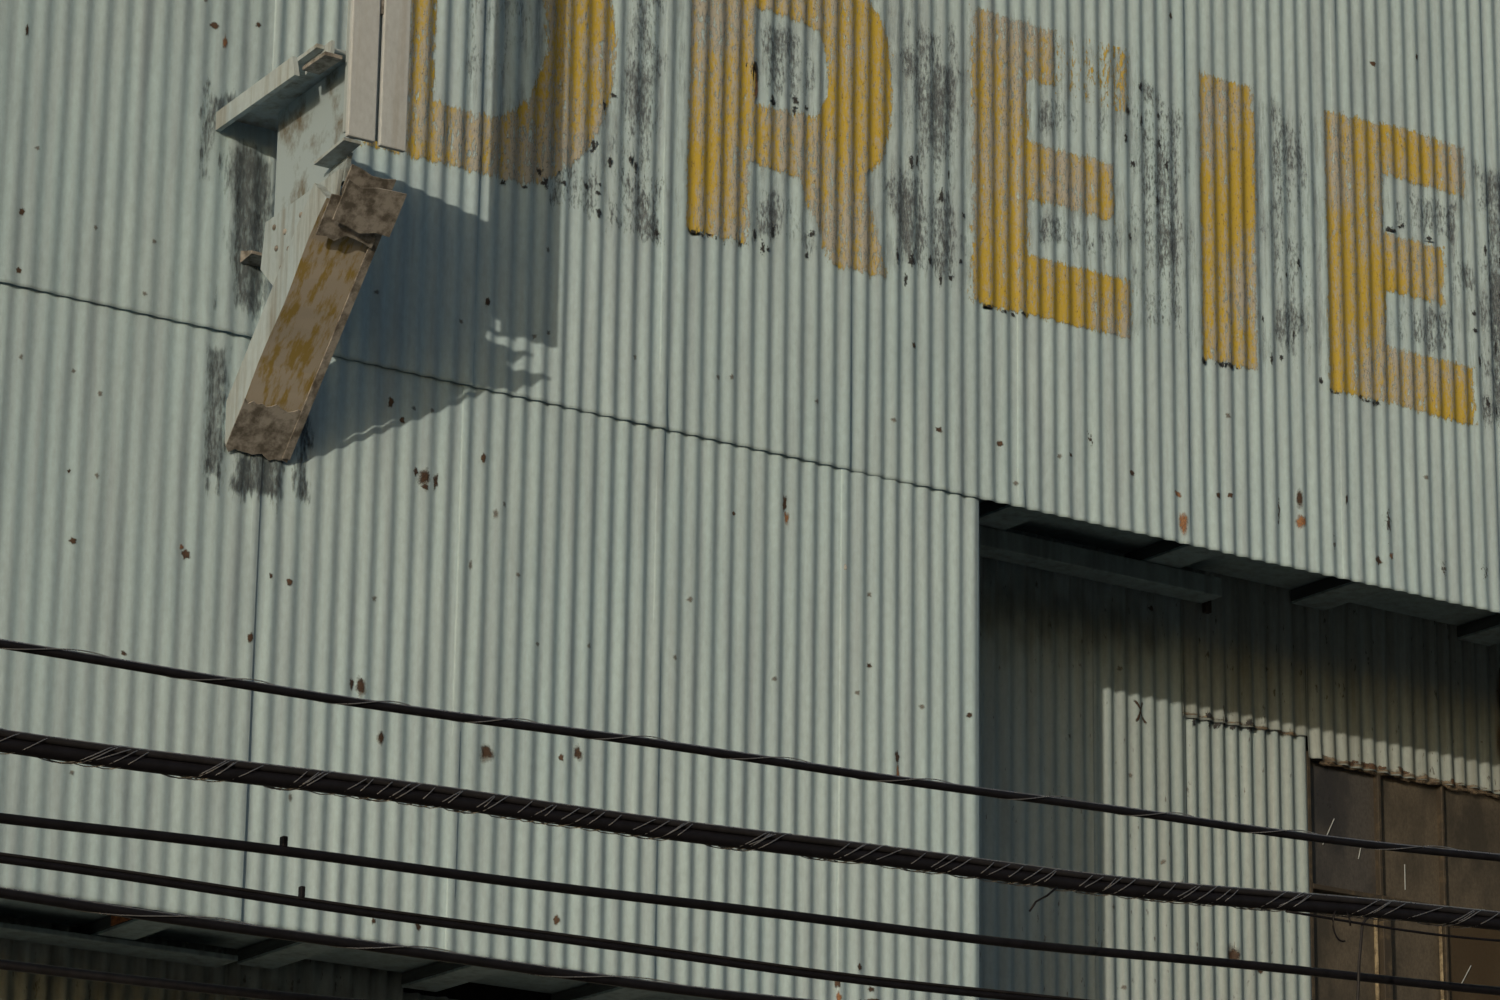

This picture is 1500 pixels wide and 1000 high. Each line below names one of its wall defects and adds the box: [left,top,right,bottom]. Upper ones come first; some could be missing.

leakage [200,82,270,315]
peeling [500,0,661,241]
peeling [691,192,782,255]
peeling [762,28,814,116]
peeling [886,23,965,285]
peeling [1041,82,1180,278]
peeling [1262,237,1304,364]
peeling [1387,193,1456,241]
peeling [1453,172,1500,420]
leakage [205,350,312,501]
rust [1175,490,1187,532]